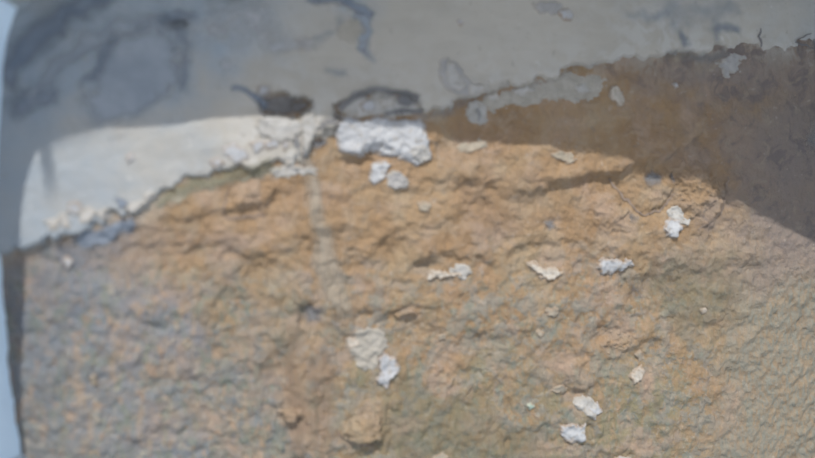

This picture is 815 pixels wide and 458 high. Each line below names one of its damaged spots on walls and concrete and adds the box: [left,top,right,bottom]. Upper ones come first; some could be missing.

leakage [2,0,192,124]
spalling [608,85,625,107]
spalling [208,85,434,190]
spalling [550,151,577,165]
flaking render [44,191,159,231]
spalling [663,206,691,239]
spalling [426,263,472,281]
spalling [526,260,564,281]
spalling [596,257,634,276]
spalling [345,327,400,389]
spalling [628,349,645,384]
spalling [559,395,603,444]